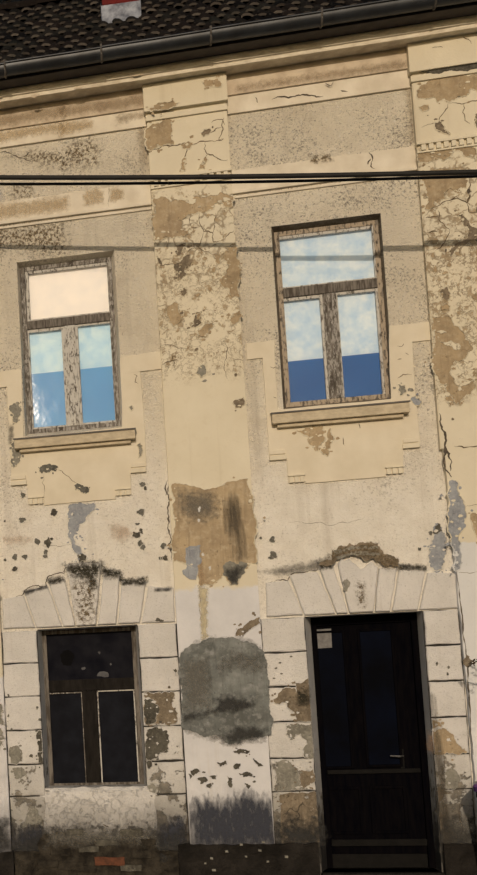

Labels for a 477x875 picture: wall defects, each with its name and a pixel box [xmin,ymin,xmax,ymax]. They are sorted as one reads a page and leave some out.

crack [255,83,348,103]
peeling [416,64,477,135]
peeling [146,192,243,352]
crack [439,413,477,477]
spalling [50,482,99,563]
peeling [158,477,278,587]
water stain [184,661,251,719]
spalling [143,686,178,769]
peeling [188,748,264,789]
water stain [226,727,263,743]
spalling [271,678,320,847]
water stain [0,793,274,849]